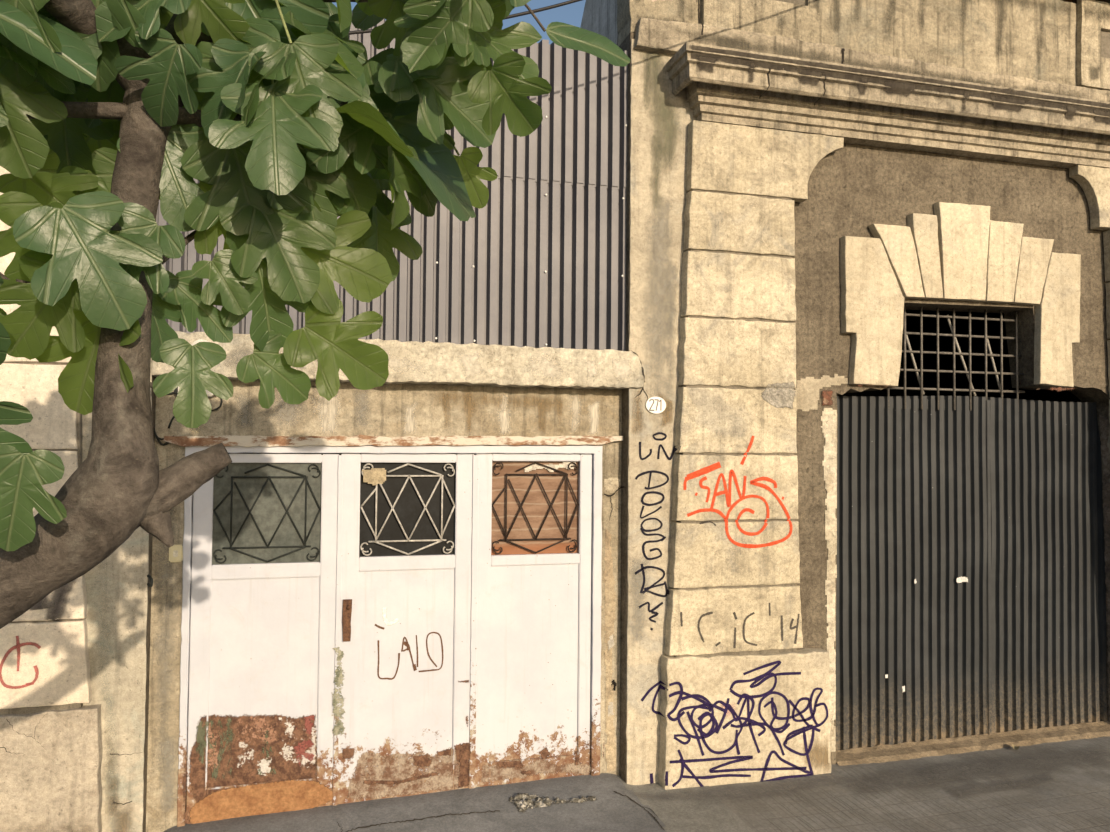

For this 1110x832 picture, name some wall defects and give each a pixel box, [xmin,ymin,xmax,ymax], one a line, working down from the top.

leakage [998,0,1054,49]
leakage [697,35,1080,120]
corrosion [182,714,333,824]
corrosion [342,738,605,801]
crack [337,810,500,832]
crack [613,791,664,830]